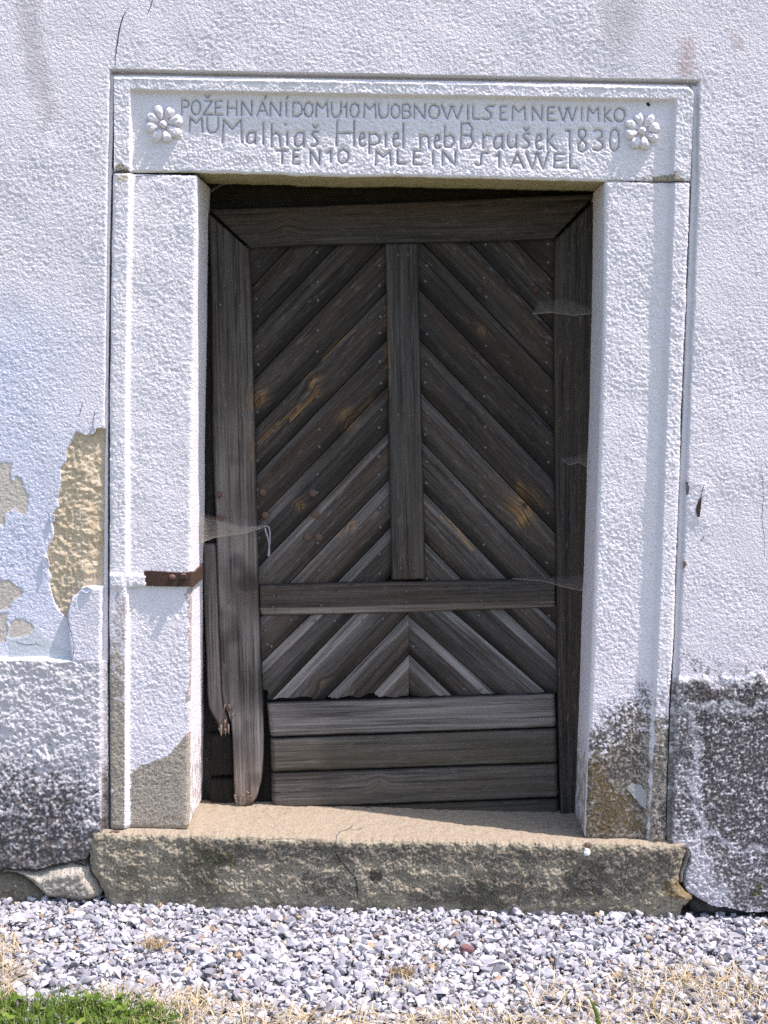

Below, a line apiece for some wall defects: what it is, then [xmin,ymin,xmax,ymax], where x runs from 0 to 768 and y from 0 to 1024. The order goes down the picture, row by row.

peeling [0,462,29,525]
flaking render [43,425,106,618]
peeling [0,580,33,643]
water stain [0,765,87,866]
water stain [206,653,768,910]